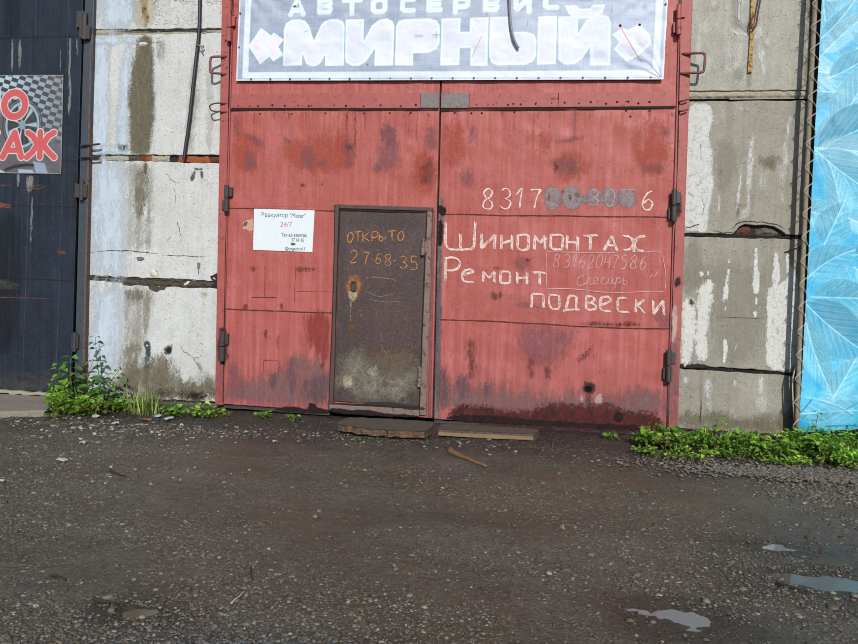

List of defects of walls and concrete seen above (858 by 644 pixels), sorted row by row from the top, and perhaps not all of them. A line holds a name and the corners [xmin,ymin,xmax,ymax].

corrosion [136,0,155,26]
damp [127,34,164,245]
peeling [88,0,221,396]
peeling [685,102,714,232]
spalling [730,221,784,236]
damp [120,290,243,402]
corrosion [346,276,362,310]
flaking render [765,253,799,371]